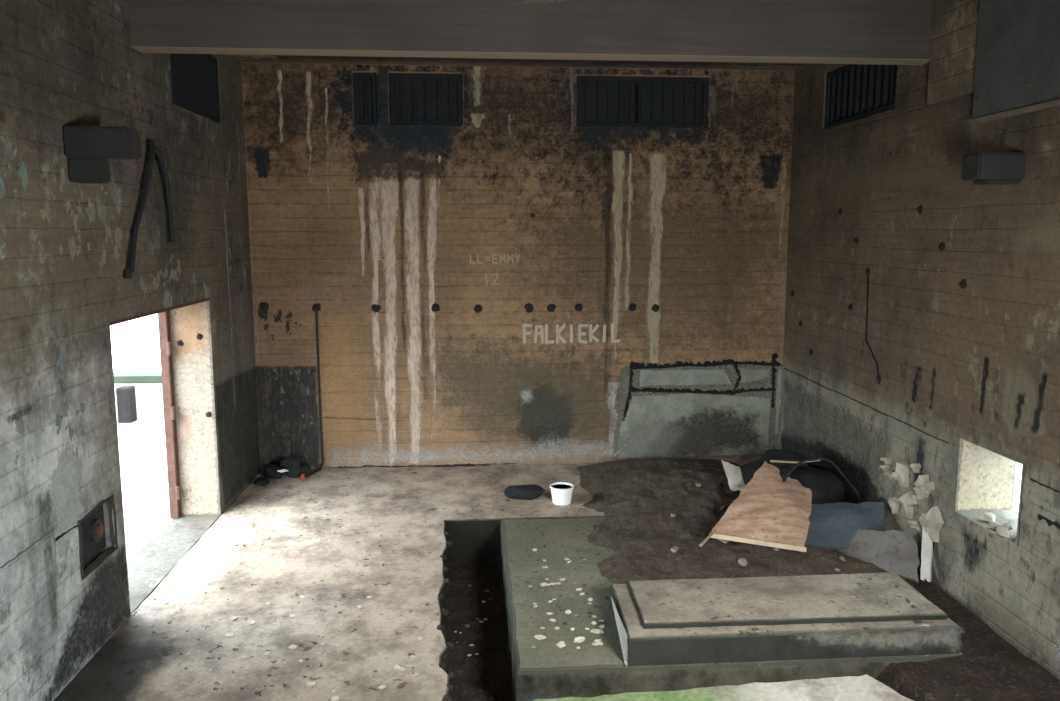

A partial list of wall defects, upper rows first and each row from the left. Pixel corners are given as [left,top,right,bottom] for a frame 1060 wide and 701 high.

peeling [0,149,28,199]
water stain [216,209,338,503]
water stain [246,55,888,484]
water stain [45,547,131,701]